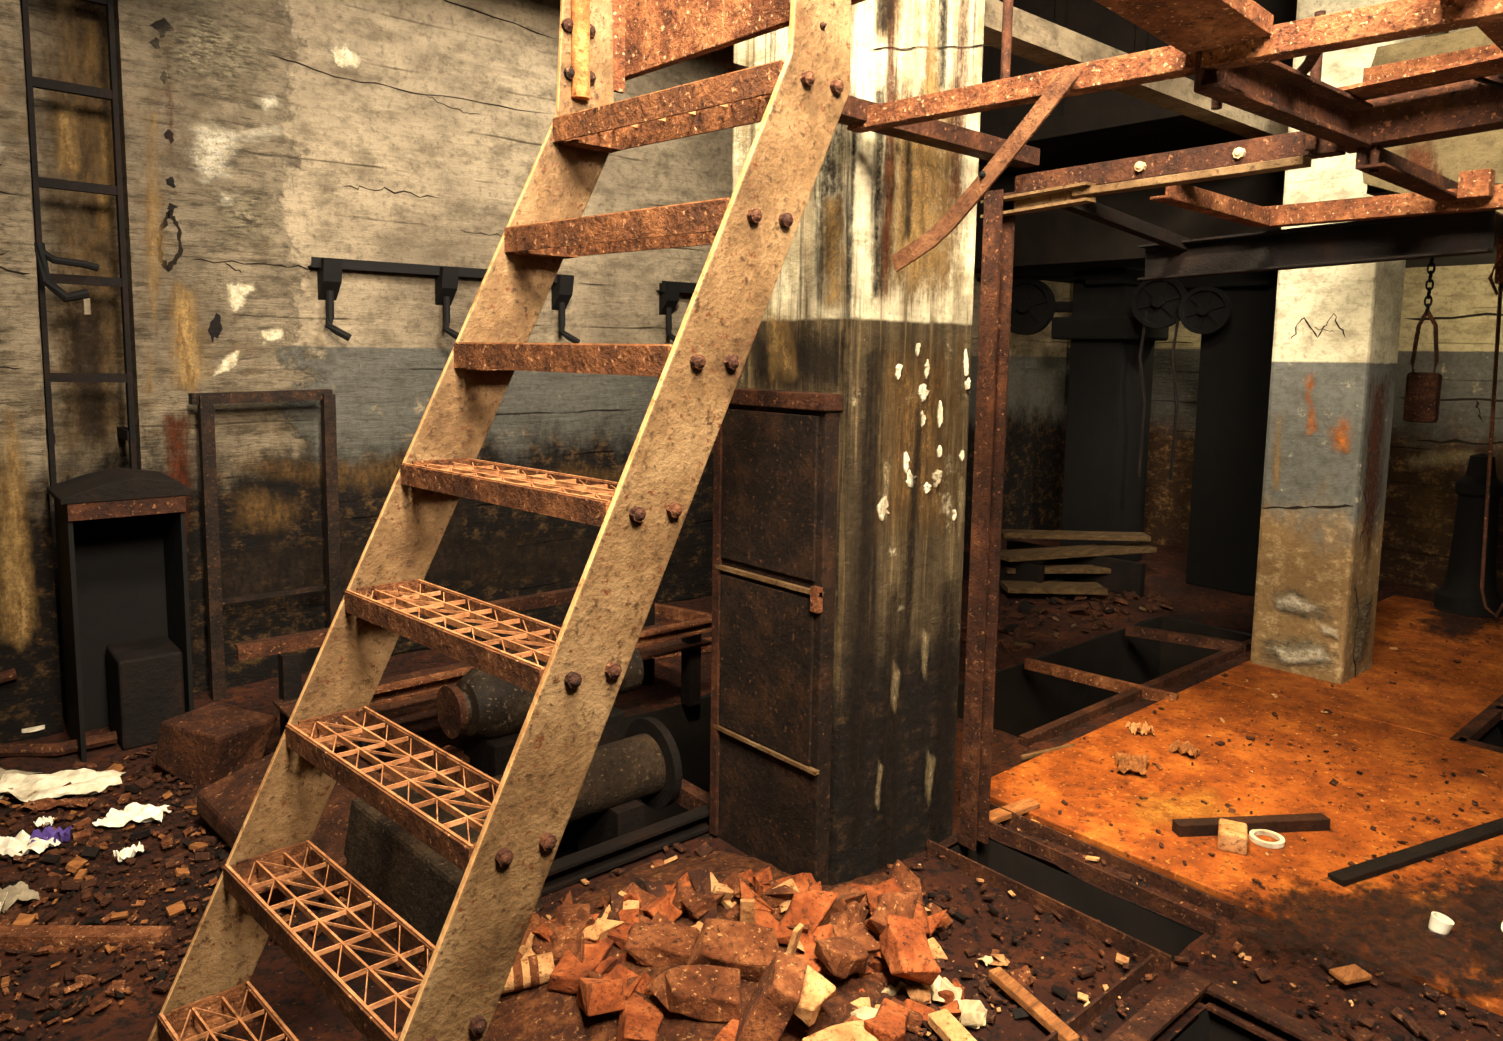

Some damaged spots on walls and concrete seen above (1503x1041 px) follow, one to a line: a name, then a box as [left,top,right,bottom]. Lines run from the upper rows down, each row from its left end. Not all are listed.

water stain [877,0,894,31]
water stain [917,0,947,86]
crack [268,54,549,115]
crack [348,185,437,198]
crack [194,259,313,272]
peeling [227,283,254,312]
peeling [963,349,971,390]
peeling [895,343,964,494]
water stain [0,415,35,647]
water stain [753,123,957,867]
peeling [877,496,889,521]
rust [1363,382,1388,567]